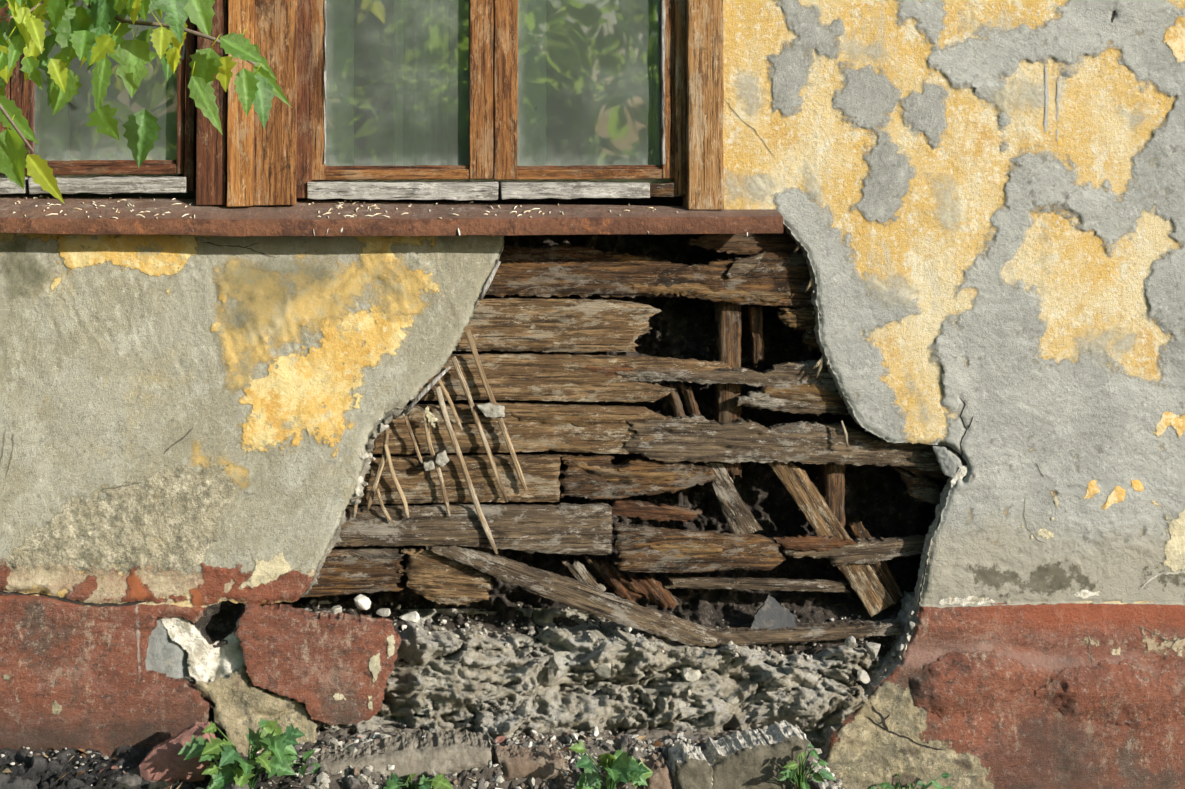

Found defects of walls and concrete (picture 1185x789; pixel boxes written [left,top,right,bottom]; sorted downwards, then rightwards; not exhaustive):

peeling [1163,16,1185,63]
peeling [0,233,210,295]
peeling [211,236,443,457]
flaking render [787,227,884,448]
flaking render [477,402,505,417]
crack [939,398,973,479]
crack [0,591,146,607]
flaking render [0,366,451,756]
spalling [825,445,995,789]
flaking render [939,595,1008,606]
damp [967,560,1099,598]
crack [865,706,946,751]